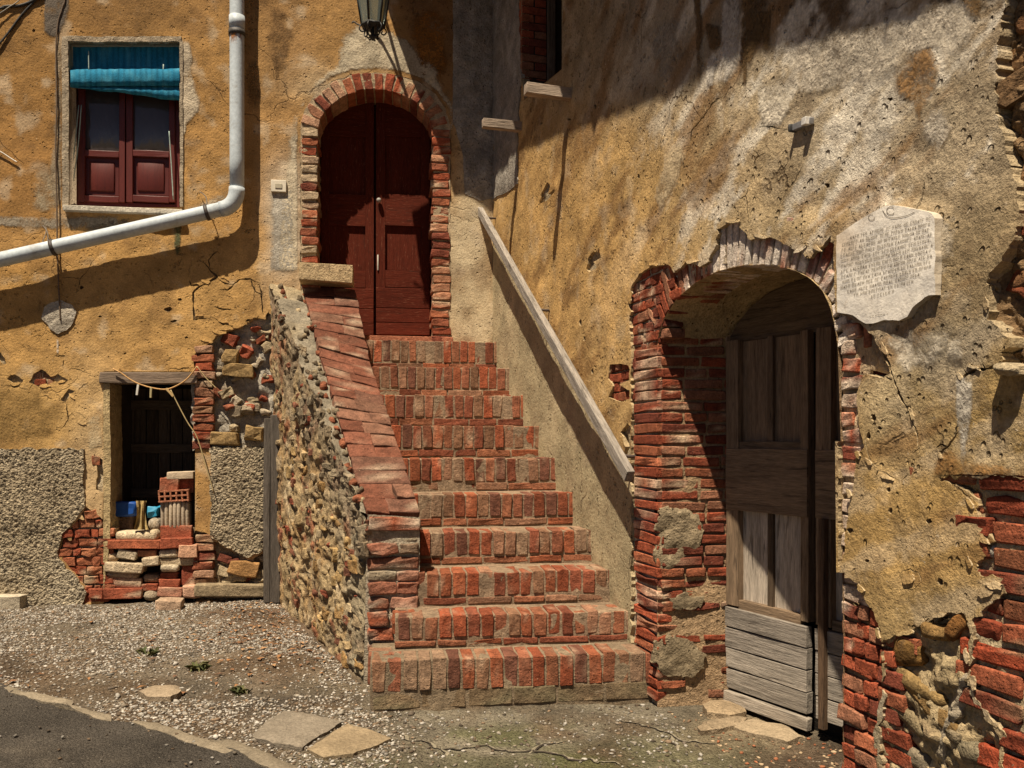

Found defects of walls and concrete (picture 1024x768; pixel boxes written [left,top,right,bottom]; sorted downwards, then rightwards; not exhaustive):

leakage [897,48,938,117]
spalling [996,0,1024,181]
crack [190,252,263,327]
spalling [983,227,1024,364]
spalling [0,352,75,402]
spalling [185,313,275,450]
spalling [840,314,949,394]
crack [880,342,916,427]
spalling [609,219,768,651]
spalling [842,407,882,463]
spalling [58,507,119,603]
spalling [837,473,1024,768]